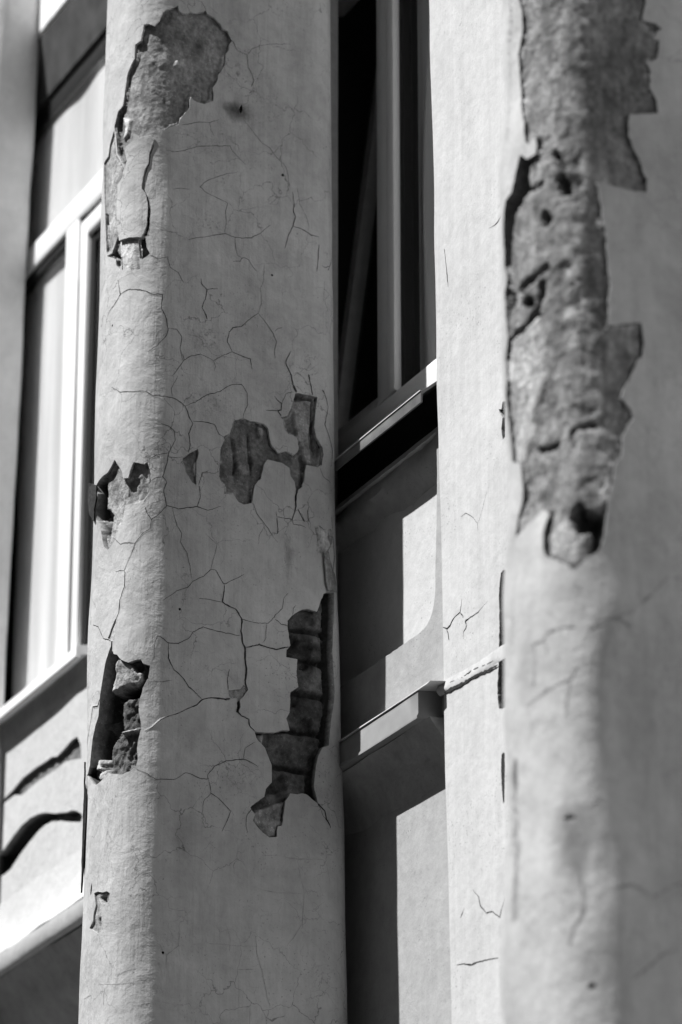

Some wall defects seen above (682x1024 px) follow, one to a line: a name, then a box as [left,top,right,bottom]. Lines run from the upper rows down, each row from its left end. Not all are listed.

spalling [104,6,232,270]
spalling [499,0,661,570]
spalling [88,460,151,550]
crack [94,120,333,831]
spalling [219,393,322,504]
spalling [0,619,150,934]
crack [86,699,104,794]
spalling [250,525,337,837]
crack [443,570,670,715]